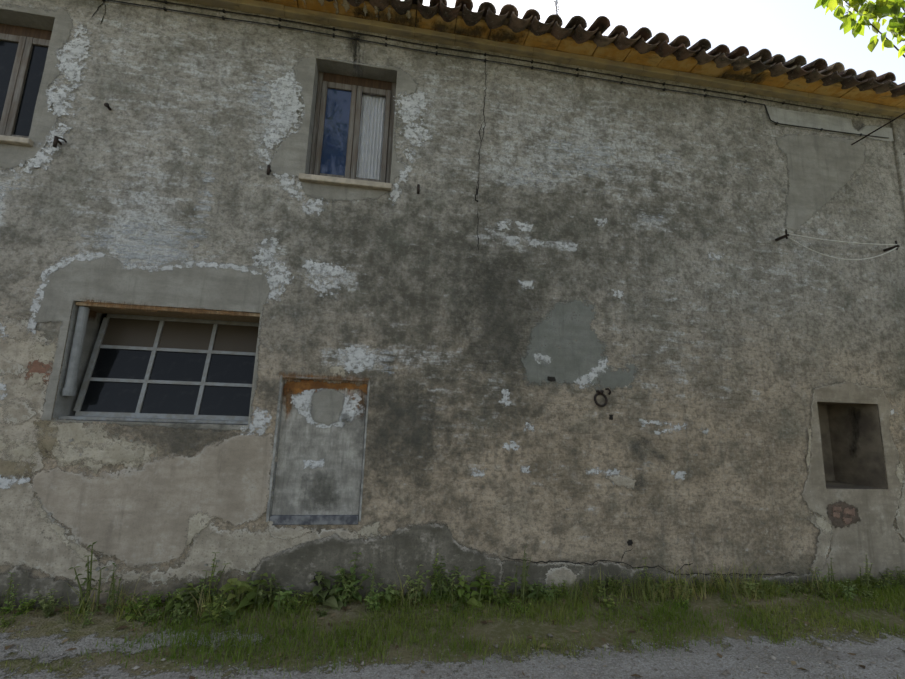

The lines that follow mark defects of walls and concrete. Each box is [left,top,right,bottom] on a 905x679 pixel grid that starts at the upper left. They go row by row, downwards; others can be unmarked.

peeling [11,23,92,176]
peeling [252,70,328,216]
peeling [388,91,432,203]
crack [475,62,487,252]
peeling [123,237,350,303]
peeling [497,221,544,248]
flaking render [0,252,391,589]
peeling [573,358,609,389]
flaking render [807,501,861,573]